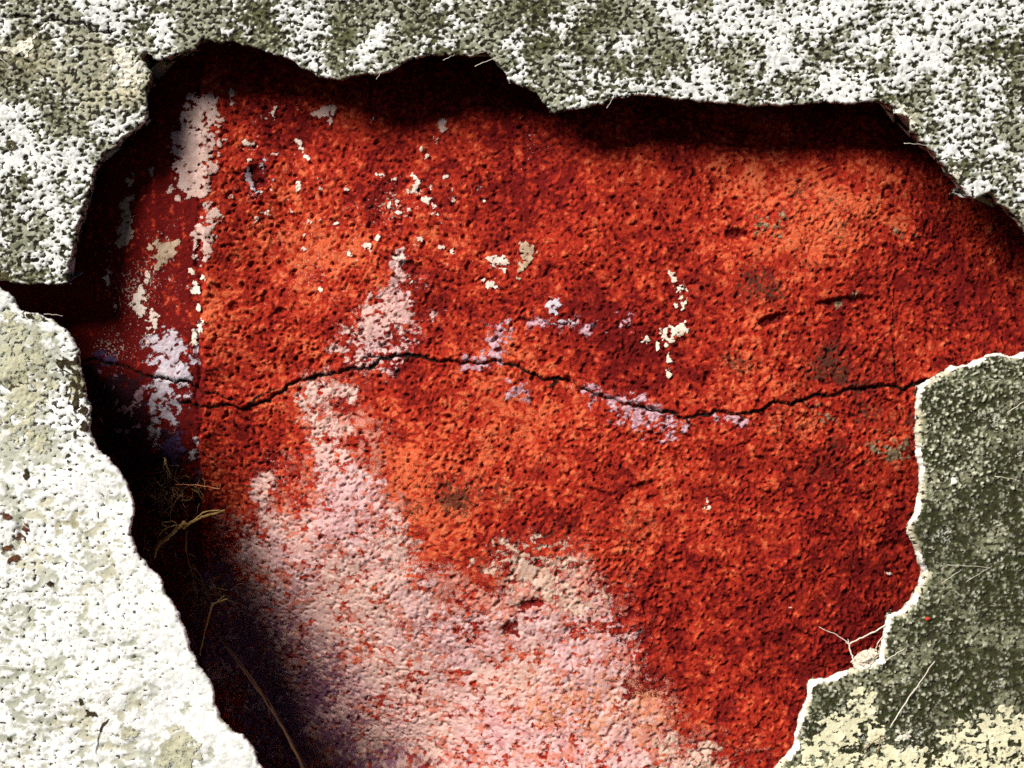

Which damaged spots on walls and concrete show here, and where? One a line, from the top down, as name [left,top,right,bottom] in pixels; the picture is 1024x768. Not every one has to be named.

spalling [1,34,38,57]
spalling [100,46,144,92]
spalling [895,104,921,130]
spalling [242,139,279,195]
peeling [113,88,235,346]
peeling [387,172,456,218]
peeling [482,241,538,289]
peeling [545,296,576,325]
peeling [641,270,689,379]
crack [53,293,925,426]
peeling [775,352,1024,768]
spalling [502,600,545,638]